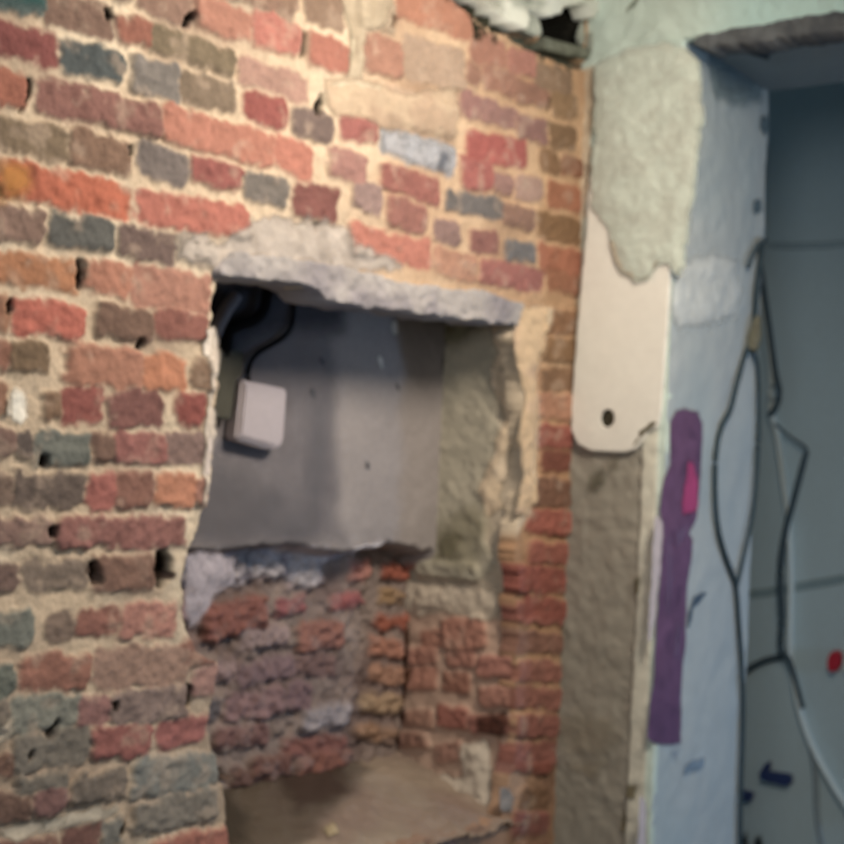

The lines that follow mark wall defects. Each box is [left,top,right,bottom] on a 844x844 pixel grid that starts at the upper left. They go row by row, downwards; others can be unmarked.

peeling [492,447,509,482]
peeling [355,541,385,550]
spalling [153,551,176,587]
flaking render [185,552,235,625]